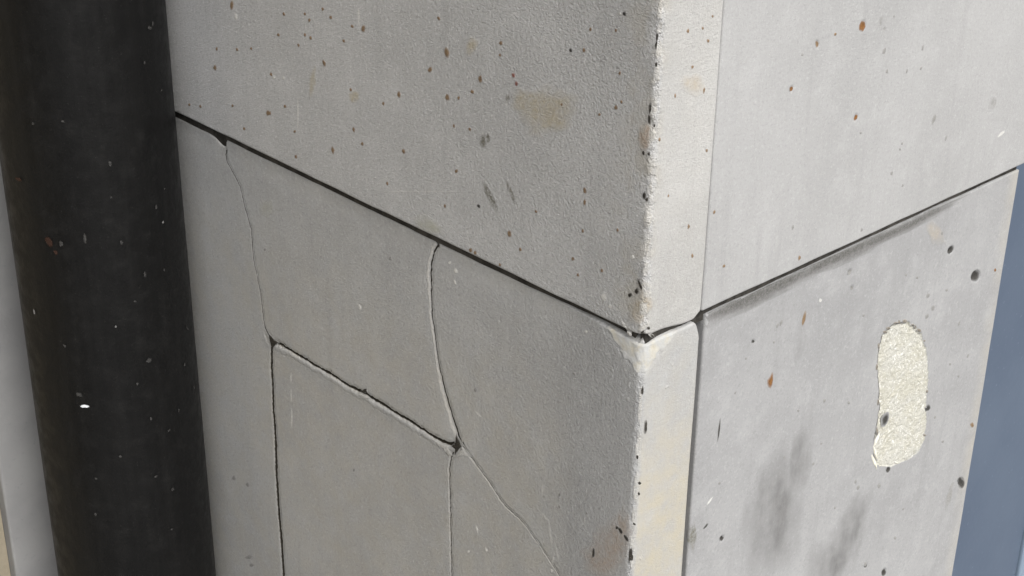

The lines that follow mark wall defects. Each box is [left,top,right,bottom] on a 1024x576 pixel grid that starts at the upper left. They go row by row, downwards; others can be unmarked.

crack [225,150,560,576]
peeling [871,293,936,488]